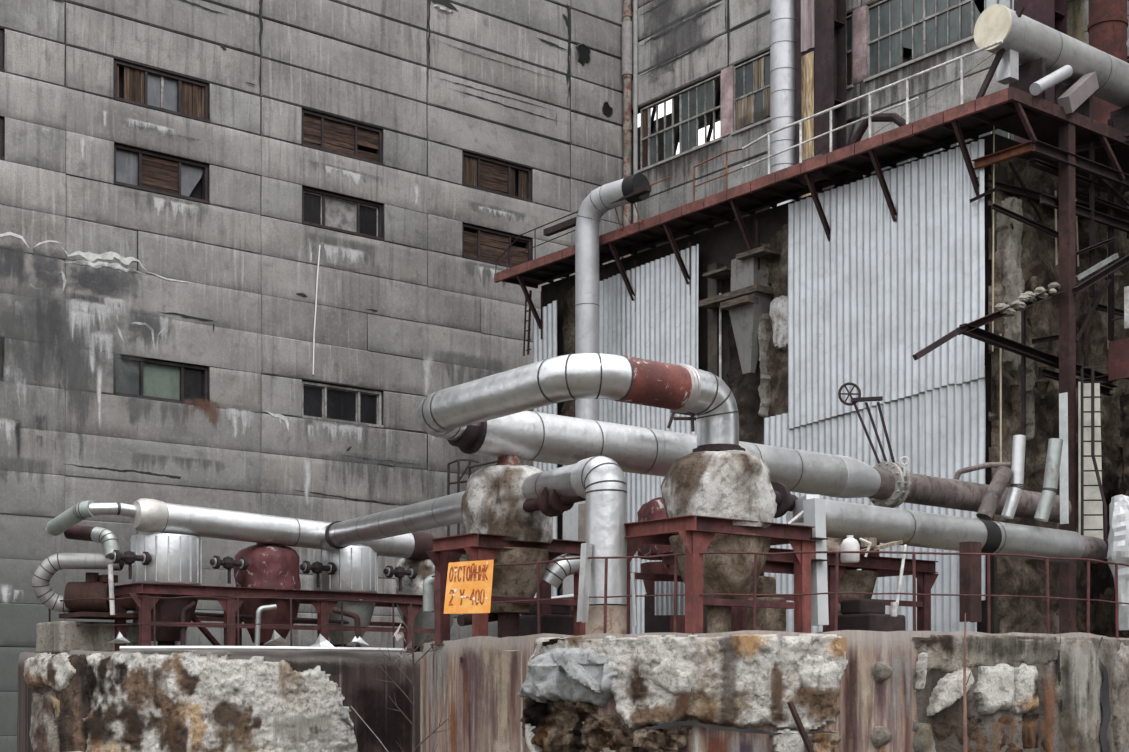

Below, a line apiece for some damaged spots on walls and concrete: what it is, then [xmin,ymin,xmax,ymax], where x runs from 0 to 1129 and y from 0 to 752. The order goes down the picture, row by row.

damp [0,232,195,443]
spalling [24,651,358,752]
corrosion [450,662,467,752]
spalling [520,631,848,752]
corrosion [771,673,782,704]
spalling [912,634,1129,752]